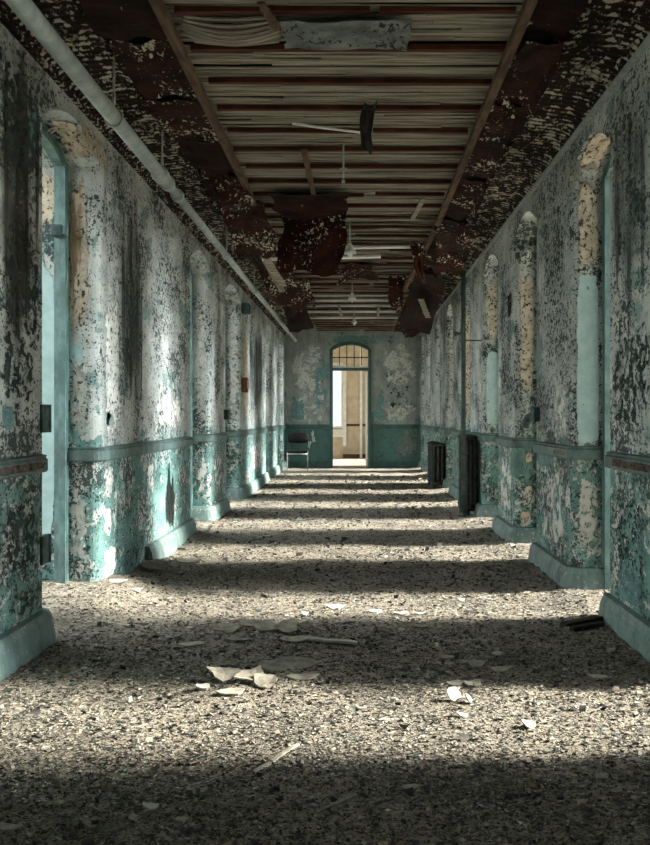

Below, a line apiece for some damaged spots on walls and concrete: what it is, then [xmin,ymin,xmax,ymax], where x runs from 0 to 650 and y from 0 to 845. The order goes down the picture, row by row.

damp [4,66,39,331]
peeling [105,255,142,438]
damp [122,223,142,384]
peeling [154,379,181,436]
peeling [156,232,182,320]
peeling [290,335,417,424]
peeling [486,133,610,446]
peeling [104,462,117,536]
spalling [104,544,141,578]
peeling [615,487,647,595]